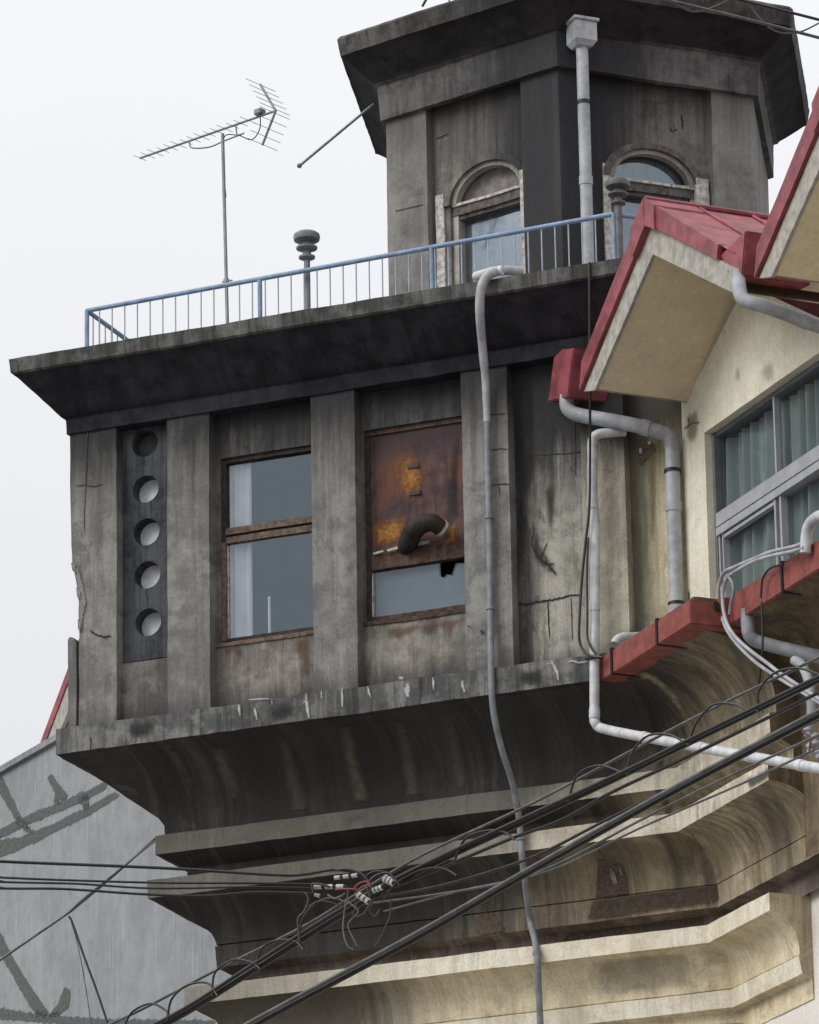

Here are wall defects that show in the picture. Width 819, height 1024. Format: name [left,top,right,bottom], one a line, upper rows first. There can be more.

crack [77,431,102,530]
corrosion [403,461,420,492]
corrosion [377,522,402,543]
crack [518,522,579,638]
spalling [68,563,86,727]